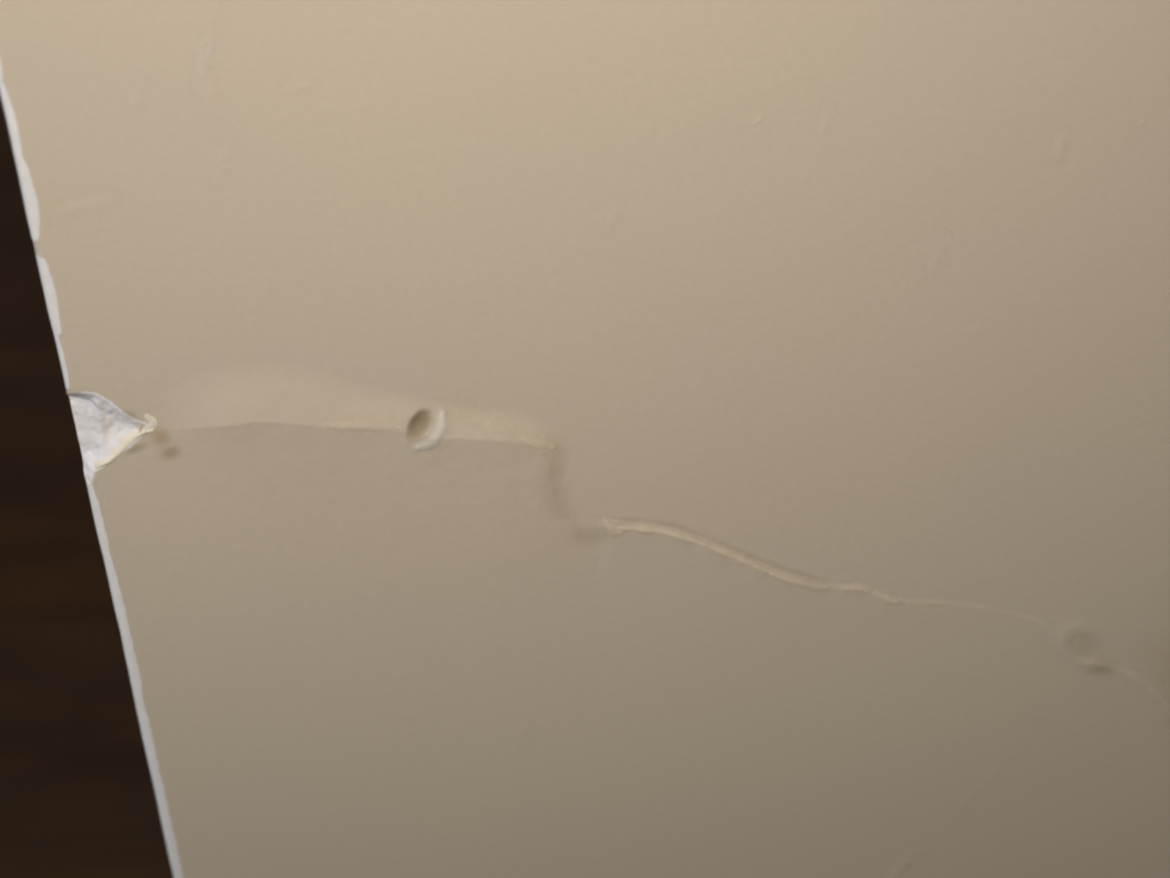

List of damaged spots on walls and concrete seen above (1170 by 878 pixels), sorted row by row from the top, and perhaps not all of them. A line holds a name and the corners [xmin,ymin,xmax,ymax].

peeling [0,63,183,878]